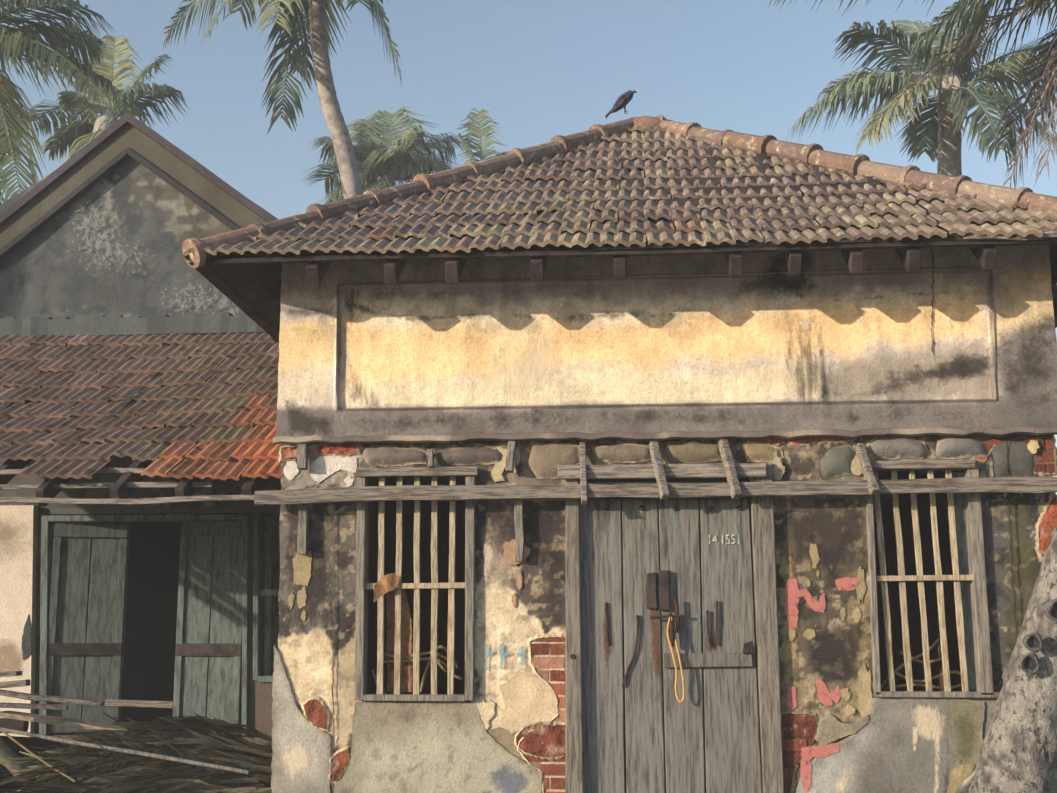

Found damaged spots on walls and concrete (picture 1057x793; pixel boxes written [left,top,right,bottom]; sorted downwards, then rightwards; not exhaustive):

damp [746,251,810,296]
crack [929,248,937,355]
damp [796,350,827,402]
damp [888,357,987,388]
flaking render [278,443,362,487]
flaking render [491,445,521,482]
flaking render [1034,492,1057,561]
flaking render [807,543,820,587]
flaking render [301,696,332,732]
flaking render [476,634,565,793]
flaking render [781,662,872,793]
flaking render [328,746,351,785]